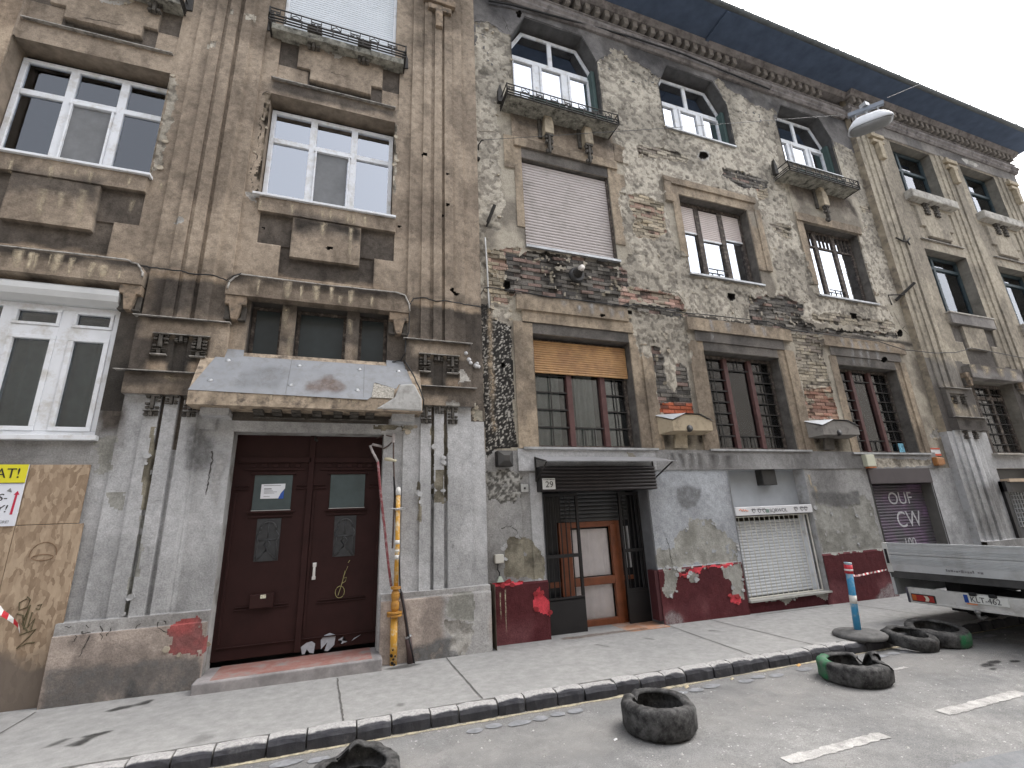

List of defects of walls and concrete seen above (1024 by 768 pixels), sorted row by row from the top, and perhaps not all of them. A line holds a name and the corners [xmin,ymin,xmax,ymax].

peeling [474,21,899,420]
peeling [492,535,553,617]
peeling [655,518,745,605]
peeling [162,616,211,657]